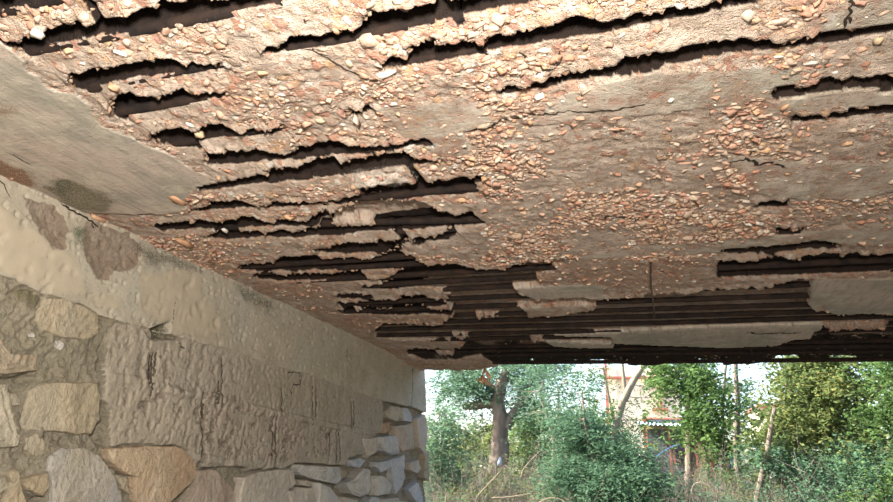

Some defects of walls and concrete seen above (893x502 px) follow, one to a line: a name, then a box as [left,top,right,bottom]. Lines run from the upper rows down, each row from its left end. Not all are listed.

crack [305,49,369,79]
crack [465,104,646,132]
crack [728,150,786,168]
spalling [0,0,893,372]